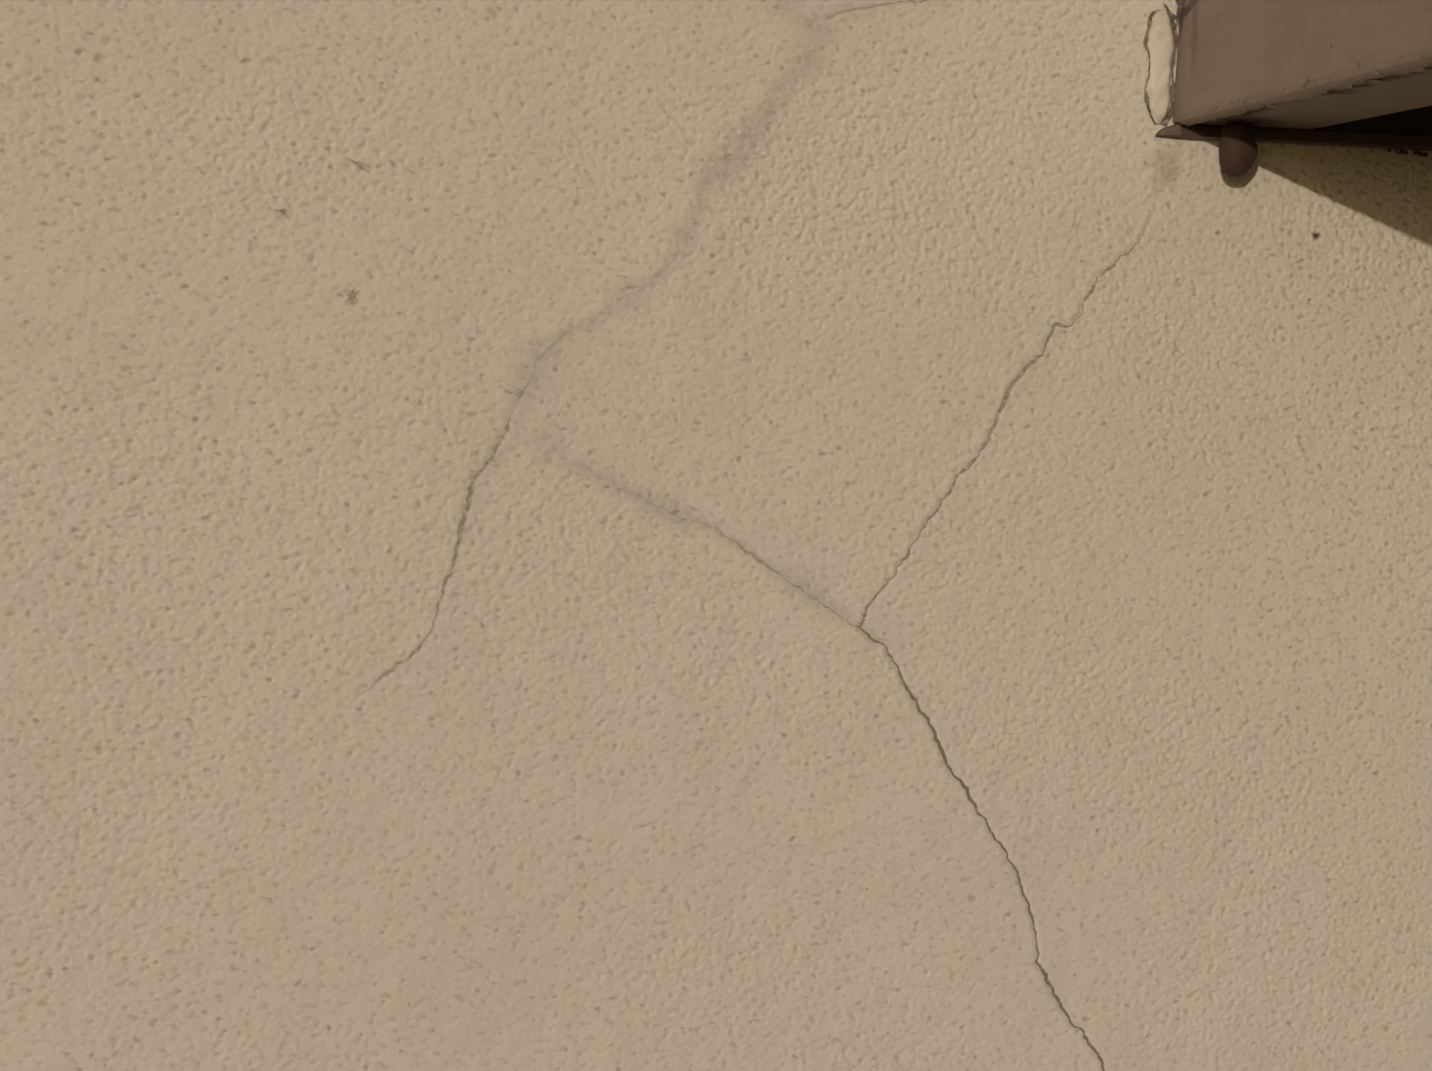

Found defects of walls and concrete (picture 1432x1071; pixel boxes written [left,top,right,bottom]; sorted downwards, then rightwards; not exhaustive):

crack [825,255,1125,1071]